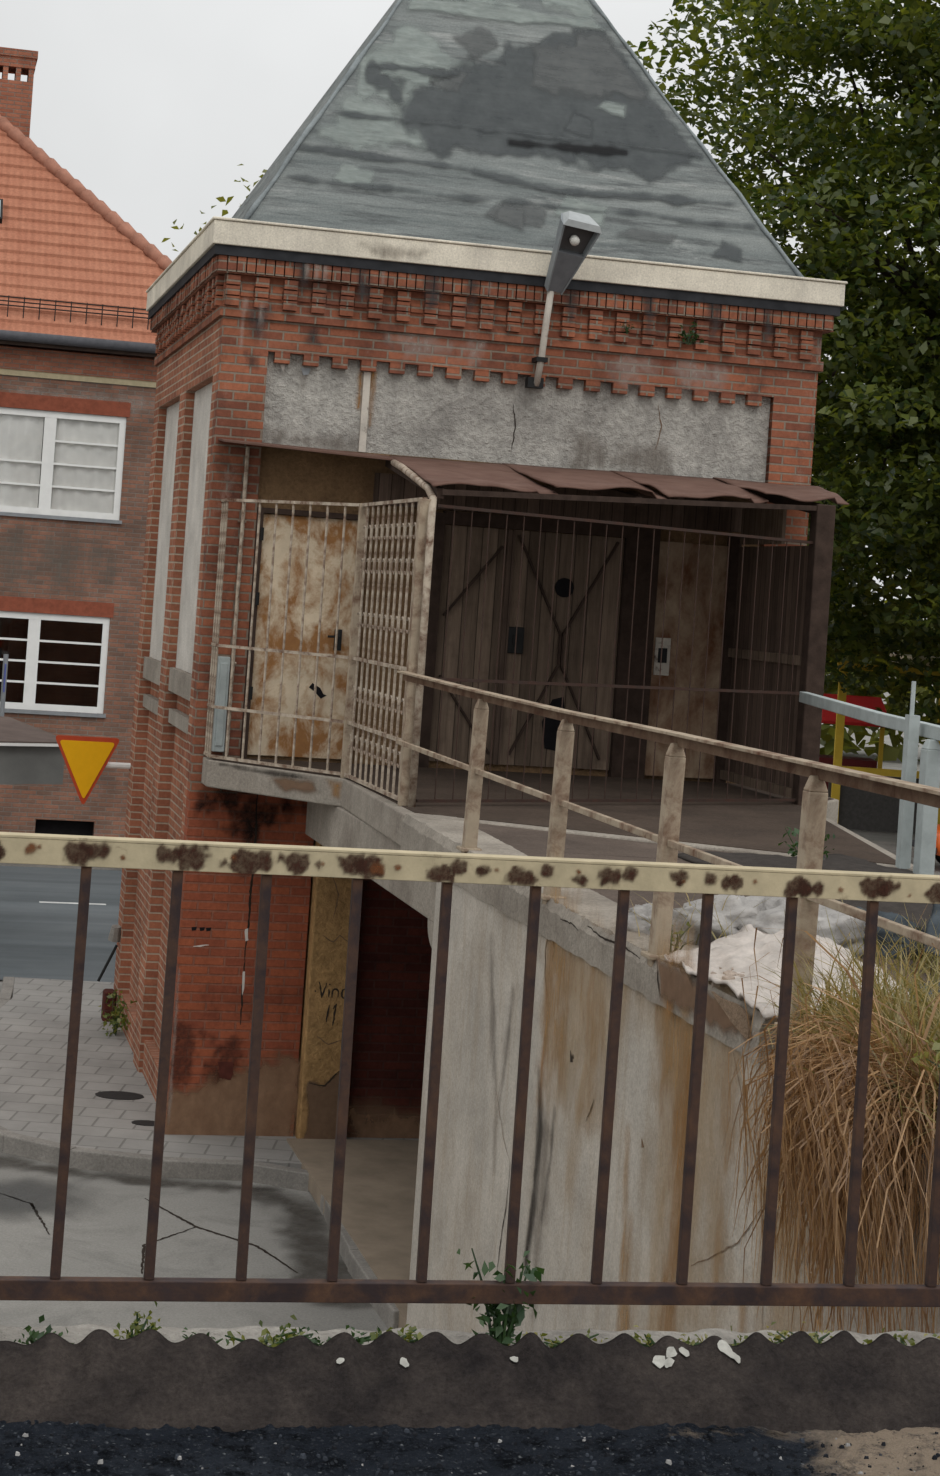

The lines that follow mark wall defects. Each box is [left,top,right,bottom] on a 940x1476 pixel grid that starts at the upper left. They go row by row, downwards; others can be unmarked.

rust [64,842,125,866]
rust [157,844,401,879]
crack [1,1193,49,1234]
crack [141,1198,298,1274]